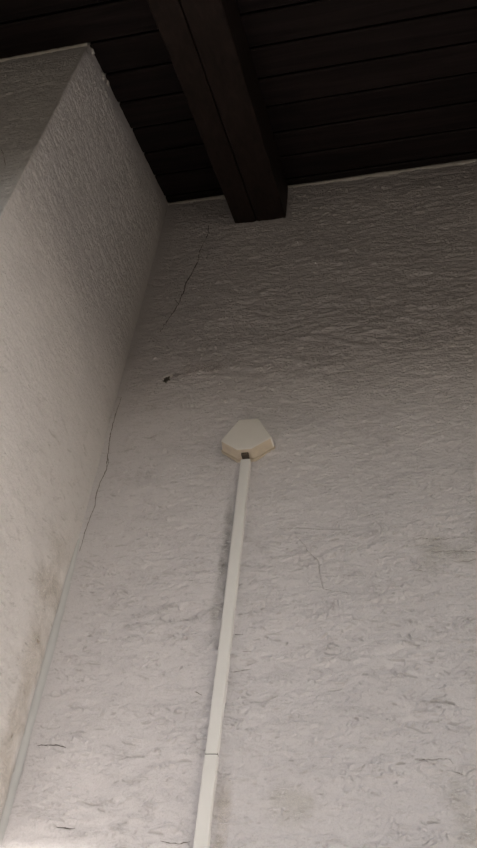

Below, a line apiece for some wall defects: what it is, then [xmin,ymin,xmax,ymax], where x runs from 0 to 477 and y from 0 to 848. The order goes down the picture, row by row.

crack [80,397,122,549]